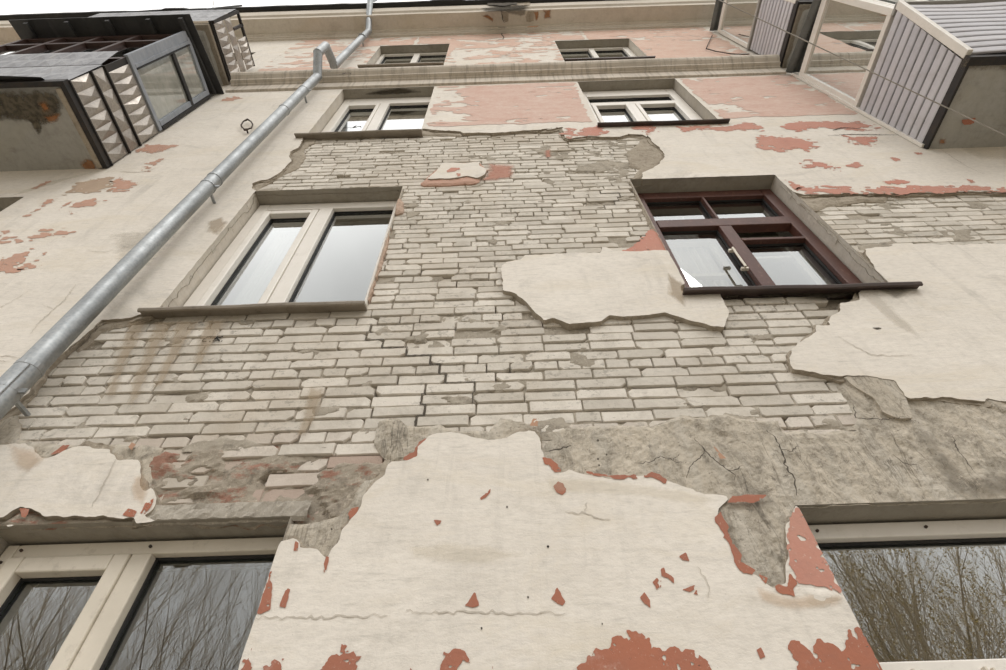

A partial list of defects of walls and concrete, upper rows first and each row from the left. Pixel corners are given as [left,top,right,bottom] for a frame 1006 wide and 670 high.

peeling [259,2,747,71]
flaking render [0,75,1006,531]
crack [641,440,742,480]
crack [767,431,797,495]
peeling [715,494,842,596]
peeling [257,571,290,614]
peeling [640,568,698,608]
peeling [241,648,284,670]
peeling [321,644,361,670]
peeling [440,648,470,670]
peeling [577,630,712,670]
peeling [788,627,882,670]